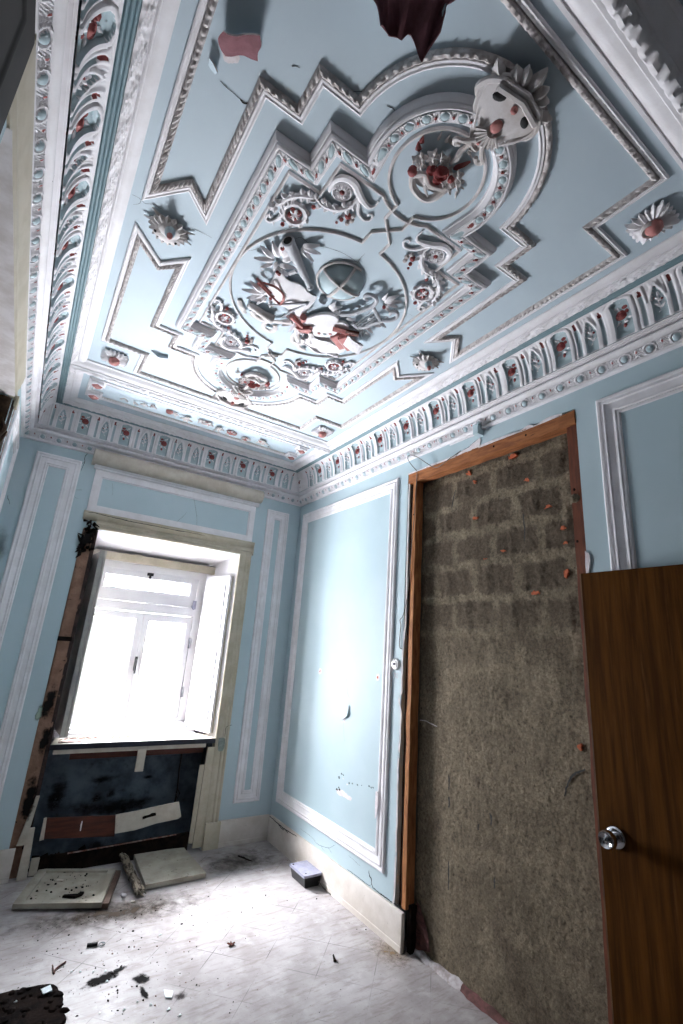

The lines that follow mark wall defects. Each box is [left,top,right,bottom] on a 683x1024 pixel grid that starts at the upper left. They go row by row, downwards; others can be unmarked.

flaking render [208,31,262,74]
flaking render [9,519,99,881]
flaking render [336,773,379,819]